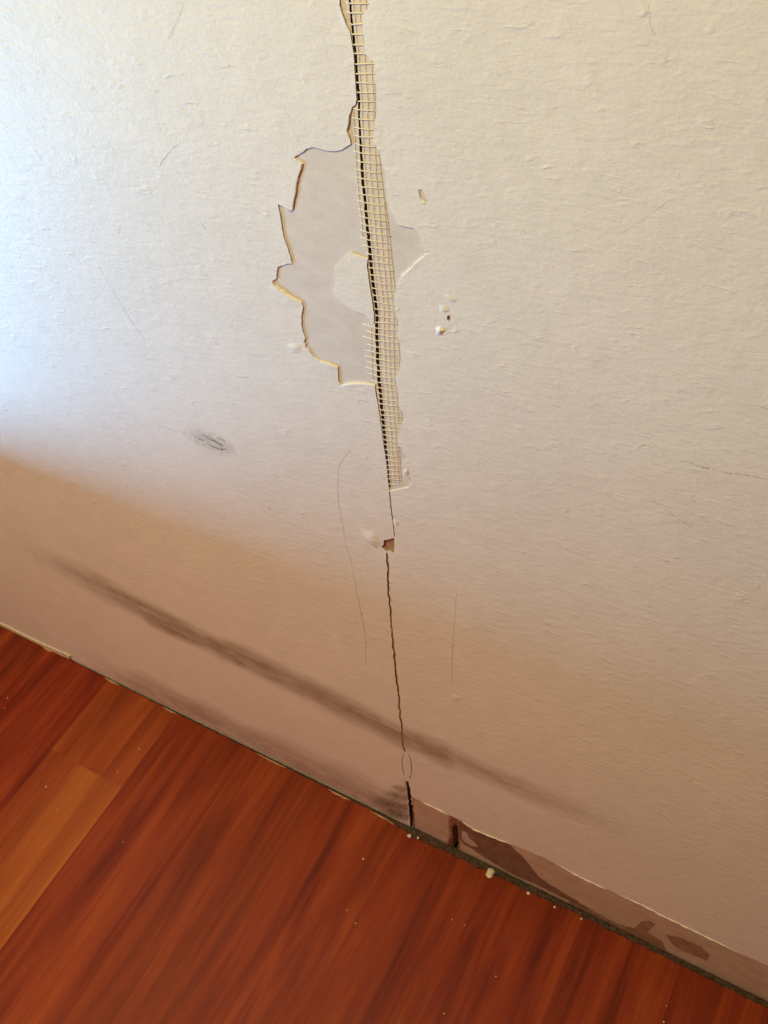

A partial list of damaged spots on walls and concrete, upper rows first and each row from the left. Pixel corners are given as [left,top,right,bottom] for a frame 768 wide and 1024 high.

peeling [267,0,412,491]
crack [349,0,414,827]
peeling [379,153,430,291]